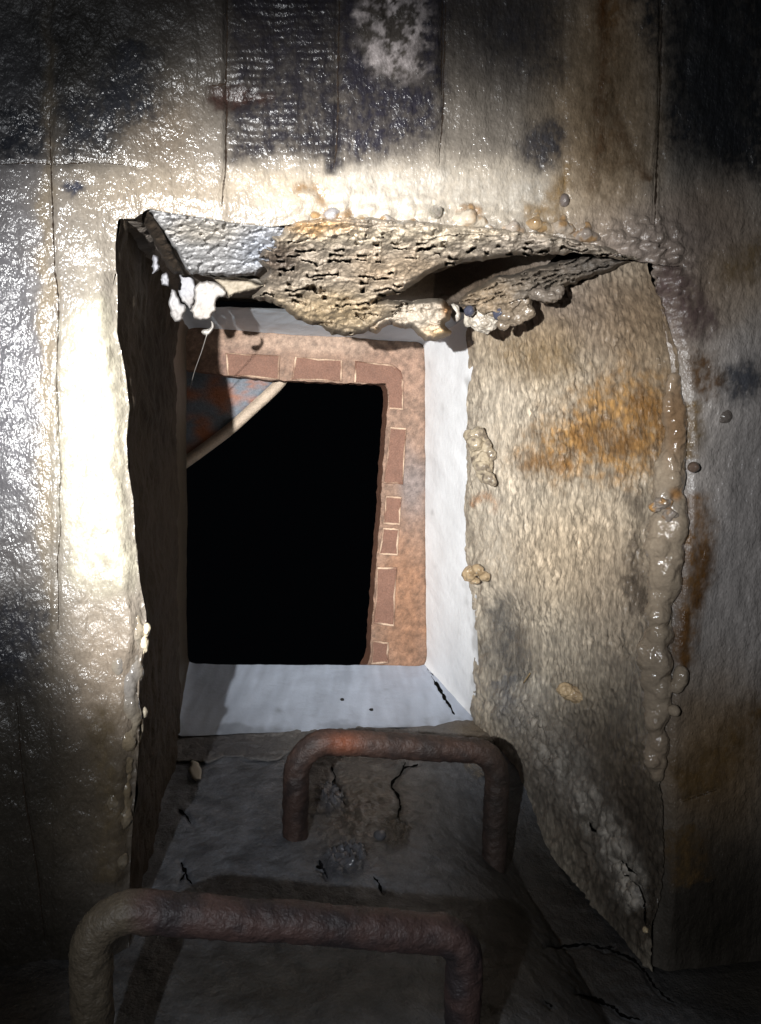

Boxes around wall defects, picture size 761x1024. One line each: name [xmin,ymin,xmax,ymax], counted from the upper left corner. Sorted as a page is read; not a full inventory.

damp [230,0,647,341]
corrosion [516,373,664,478]
damp [626,372,689,782]
crack [391,762,418,822]
crack [621,860,646,925]
crack [551,943,676,1003]
crack [545,994,642,1021]